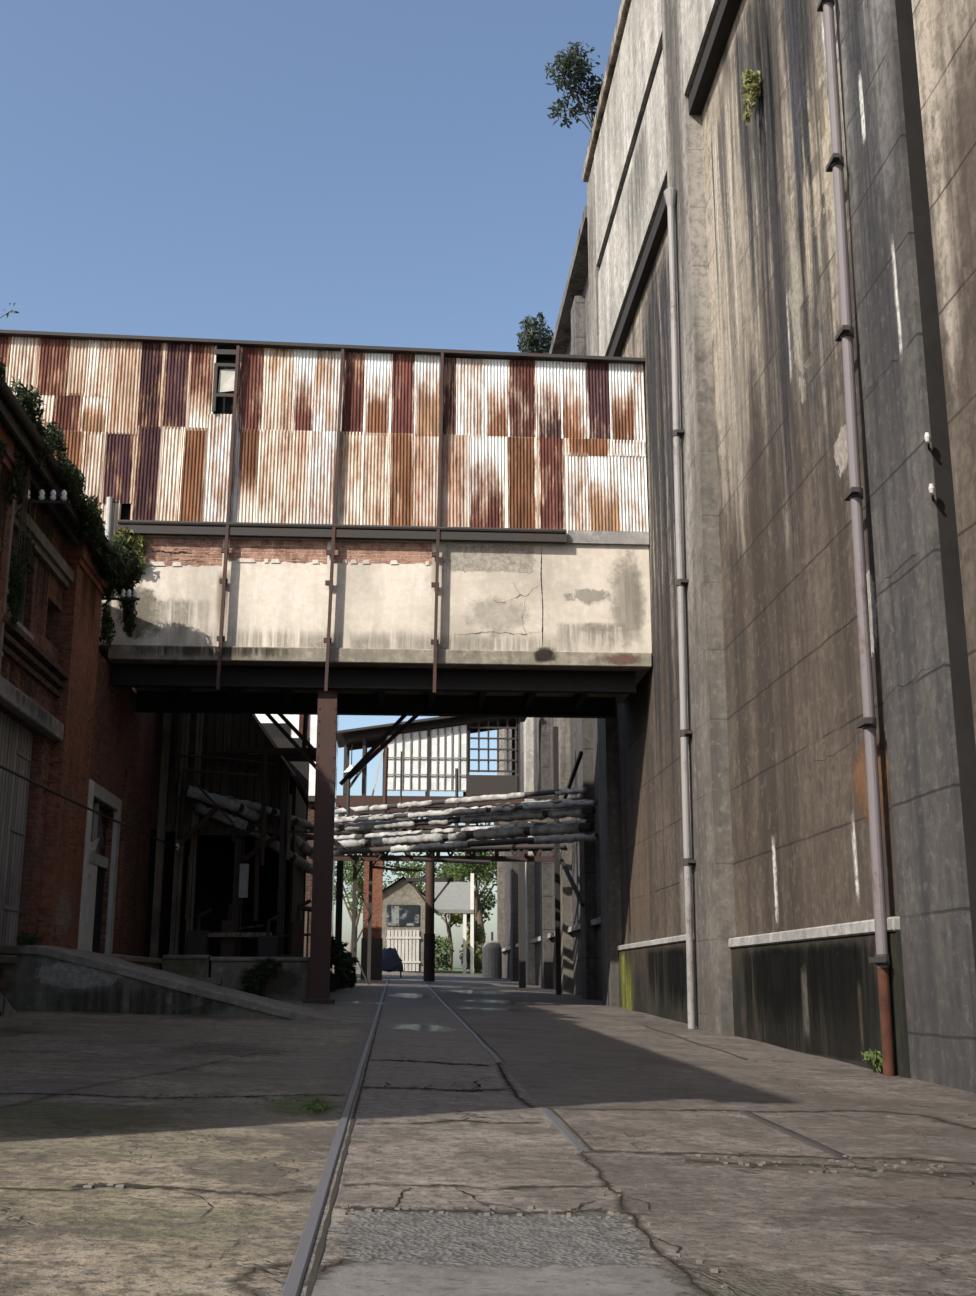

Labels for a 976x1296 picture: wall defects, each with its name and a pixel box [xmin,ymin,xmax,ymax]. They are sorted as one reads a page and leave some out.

water stain [846,0,875,257]
water stain [710,0,827,456]
water stain [892,247,902,349]
corrosion [0,336,641,531]
water stain [116,588,508,656]
flaking render [140,537,535,573]
crack [0,1150,976,1296]